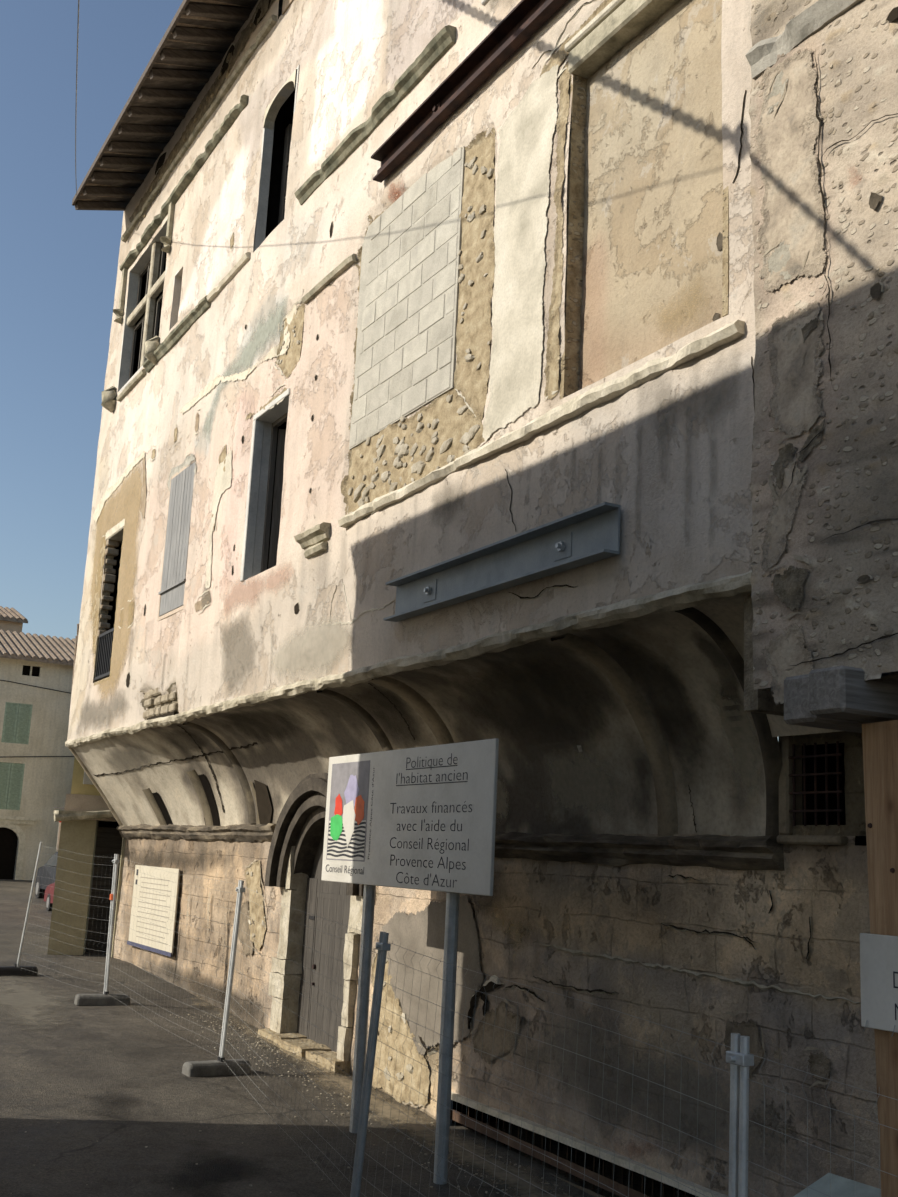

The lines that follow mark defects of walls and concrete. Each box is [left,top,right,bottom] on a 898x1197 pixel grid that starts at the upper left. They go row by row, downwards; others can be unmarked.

crack [732,90,746,183]
spalling [340,0,613,516]
crack [821,518,898,542]
crack [790,633,898,666]
crack [93,725,257,812]
crack [662,923,757,950]
crack [805,917,813,959]
peeling [371,894,483,1108]
crack [467,975,619,1029]
crack [533,941,861,1004]